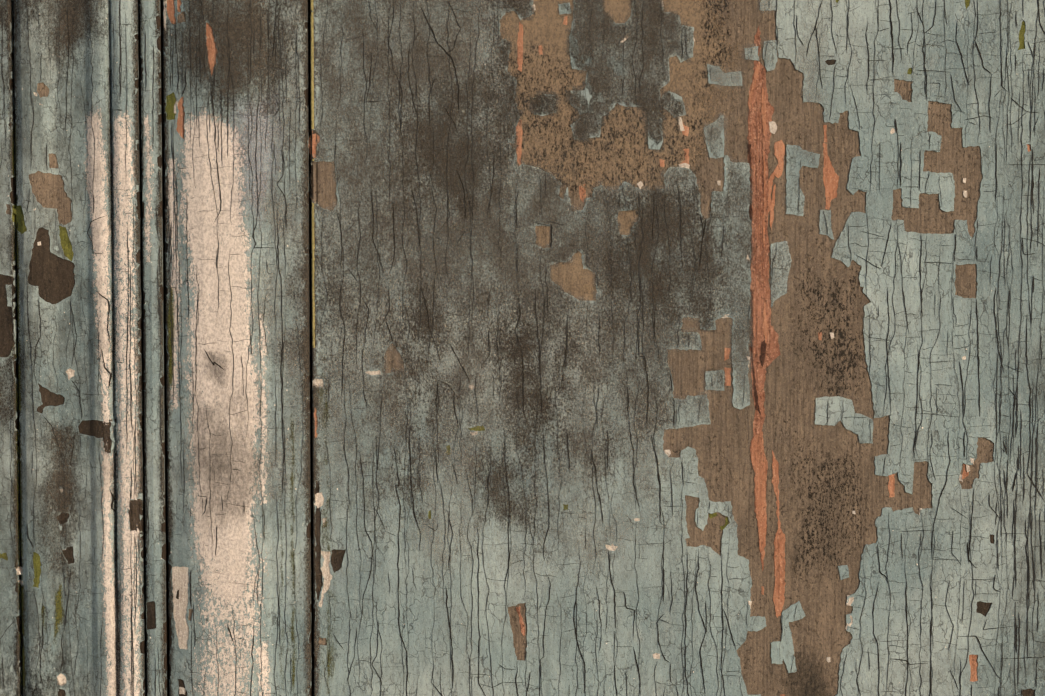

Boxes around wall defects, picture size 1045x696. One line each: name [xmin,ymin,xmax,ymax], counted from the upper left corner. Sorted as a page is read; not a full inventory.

peeling [0,274,15,357]
peeling [28,153,75,304]
peeling [78,106,156,696]
peeling [166,96,272,696]
peeling [307,129,338,211]
leakage [301,0,752,562]
peeling [499,0,933,696]
crack [750,0,1045,696]
peeling [891,101,983,238]
peeling [954,264,978,298]
peeling [959,437,994,489]
peeling [969,655,978,682]